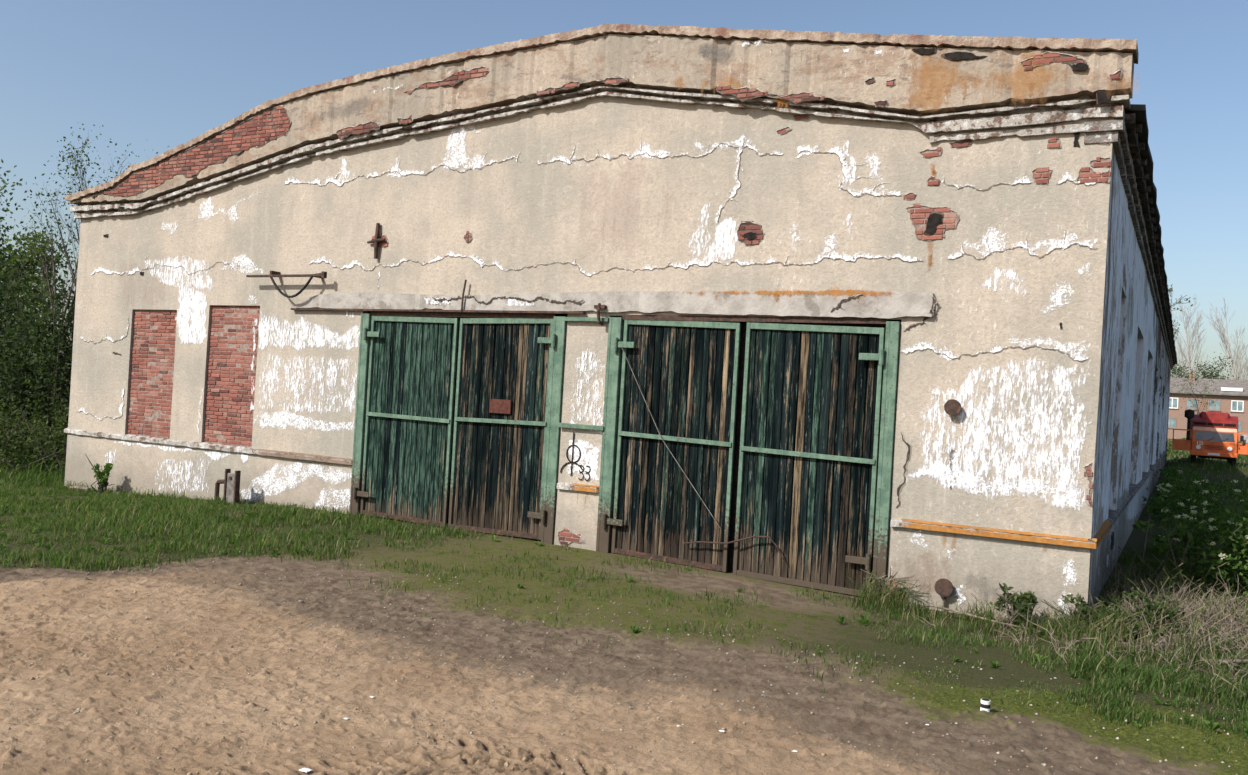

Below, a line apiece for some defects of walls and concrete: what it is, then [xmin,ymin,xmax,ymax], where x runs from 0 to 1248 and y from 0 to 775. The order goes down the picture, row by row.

spalling [374,66,489,95]
spalling [92,105,291,199]
crack [285,138,902,224]
peeling [689,202,765,261]
spalling [903,175,960,242]
crack [942,172,1096,191]
crack [309,226,1097,305]
crack [831,294,863,312]
crack [901,296,1088,362]
flaking render [105,254,360,493]
peeling [906,267,1149,614]
peeling [240,461,352,510]